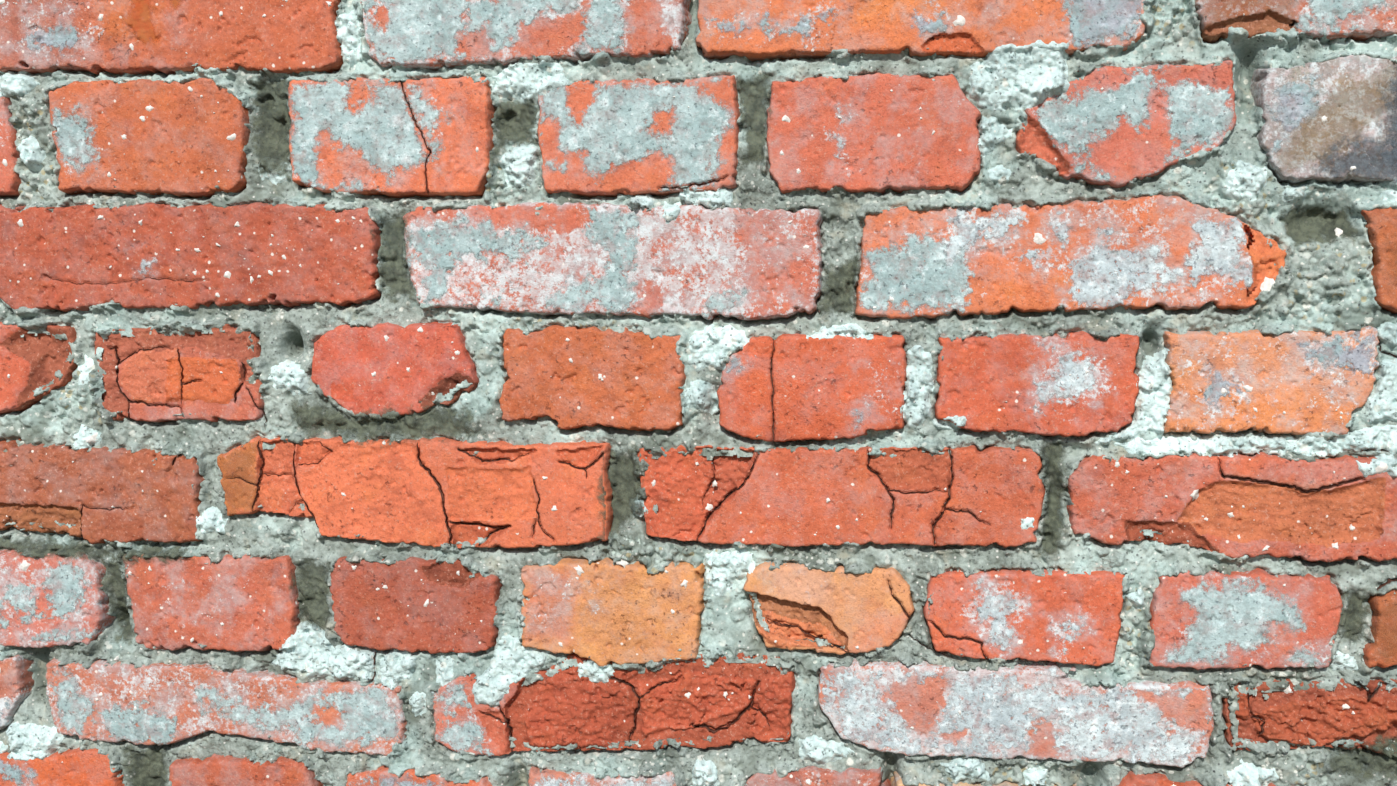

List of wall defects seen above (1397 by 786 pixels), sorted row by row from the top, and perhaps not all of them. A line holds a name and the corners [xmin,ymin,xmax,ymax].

crack [401,82,431,195]
crack [108,346,202,419]
crack [228,362,332,528]
crack [417,443,604,545]
crack [696,336,775,543]
crack [867,447,988,544]
crack [1219,449,1386,493]
peeling [974,578,1030,651]
peeling [1167,577,1307,666]
spalling [431,591,848,756]
crack [609,677,681,742]
peeling [820,616,1397,767]